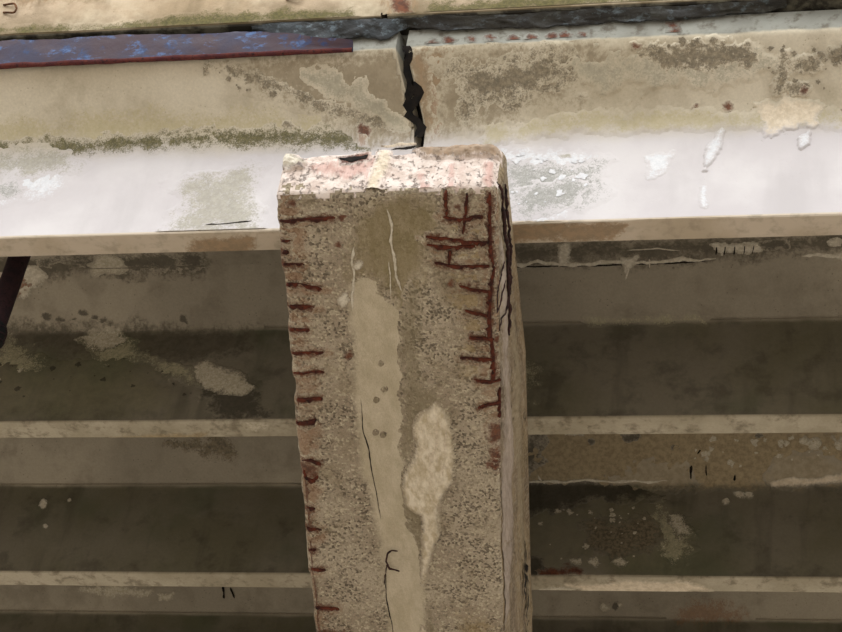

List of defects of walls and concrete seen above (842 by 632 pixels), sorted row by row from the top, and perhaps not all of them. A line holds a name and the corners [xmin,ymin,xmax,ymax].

corrosion [376,0,423,15]
water stain [427,32,779,141]
spalling [305,151,375,184]
crack [517,242,716,280]
spalling [105,430,211,438]
spalling [237,422,274,434]
water stain [0,49,514,632]
spalling [277,194,355,632]
water stain [525,339,550,410]
spalling [414,141,842,632]
crack [522,541,530,632]
water stain [569,556,629,568]